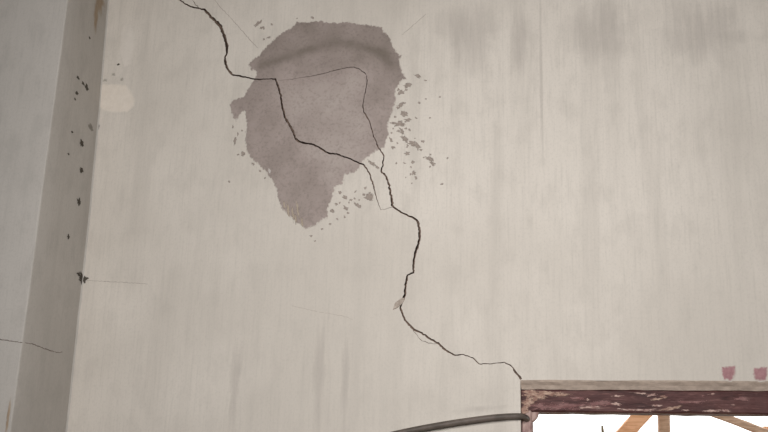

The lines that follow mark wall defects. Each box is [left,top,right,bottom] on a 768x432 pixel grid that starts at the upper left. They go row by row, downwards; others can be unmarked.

crack [180,0,522,380]
peeling [521,390,748,414]